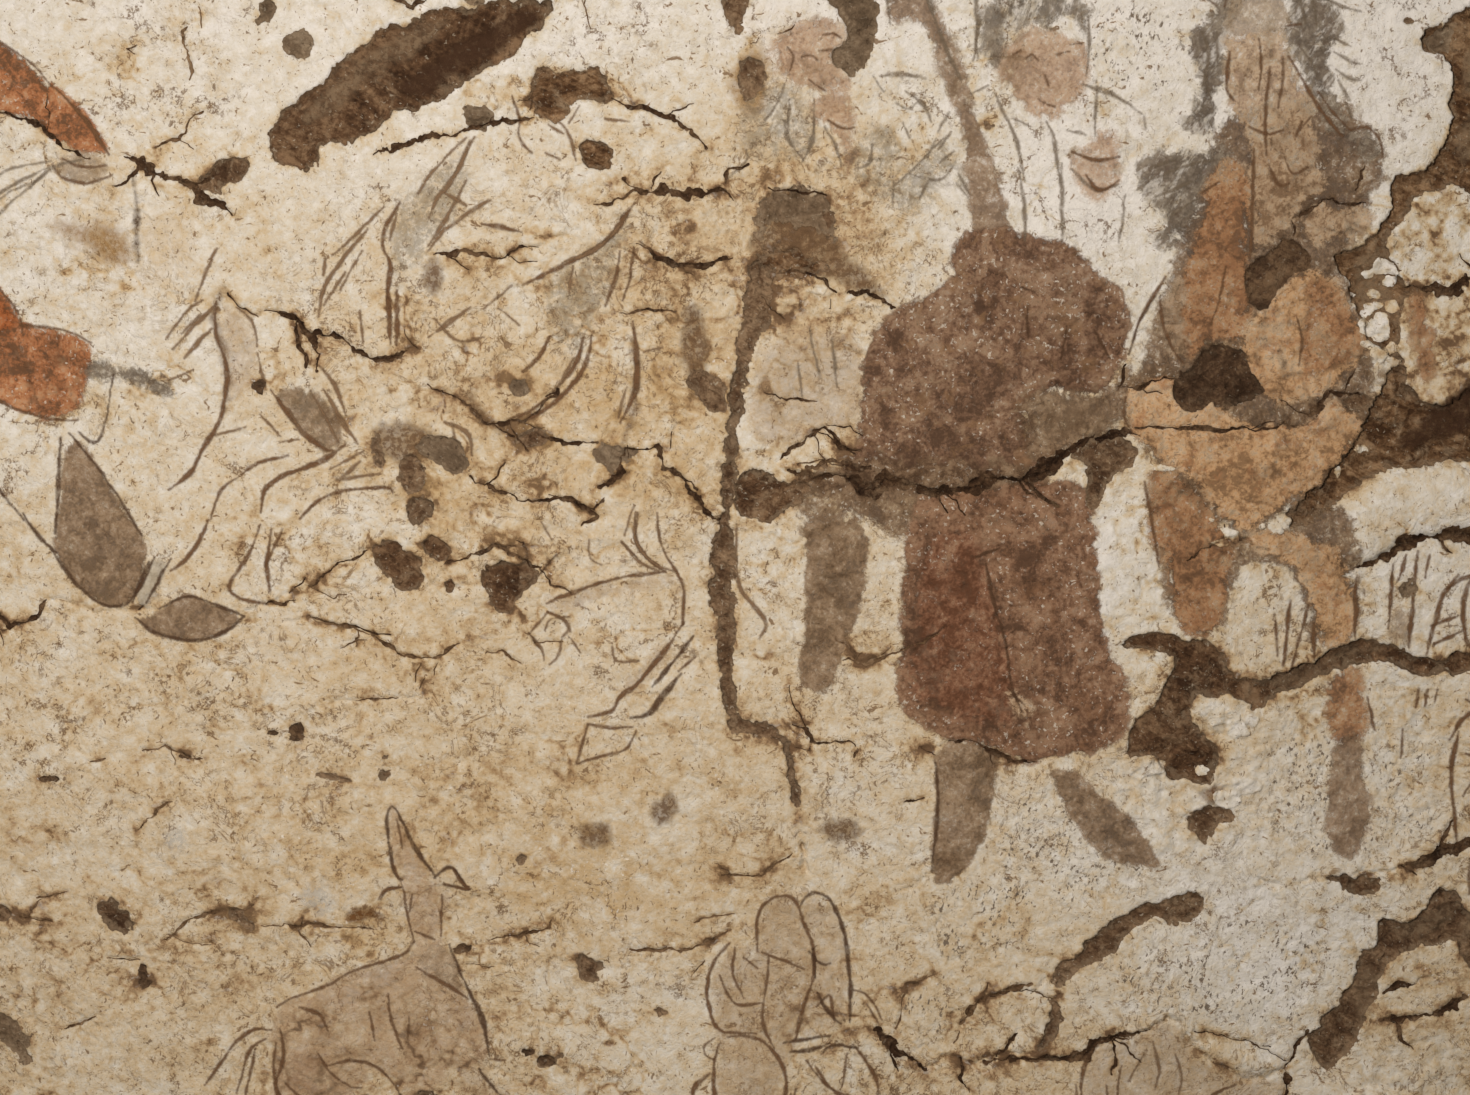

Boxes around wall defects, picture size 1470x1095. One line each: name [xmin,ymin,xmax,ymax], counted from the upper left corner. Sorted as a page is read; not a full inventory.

spalling [267,0,553,173]
crack [373,93,535,155]
crack [593,97,827,207]
spalling [828,0,880,77]
crack [227,292,418,373]
flaking render [1259,6,1470,534]
crack [427,243,1364,808]
crack [265,550,563,701]
flaking render [1122,632,1470,845]
crack [873,973,1150,1093]
spalling [1037,891,1204,1052]
flaking render [1306,887,1470,1070]